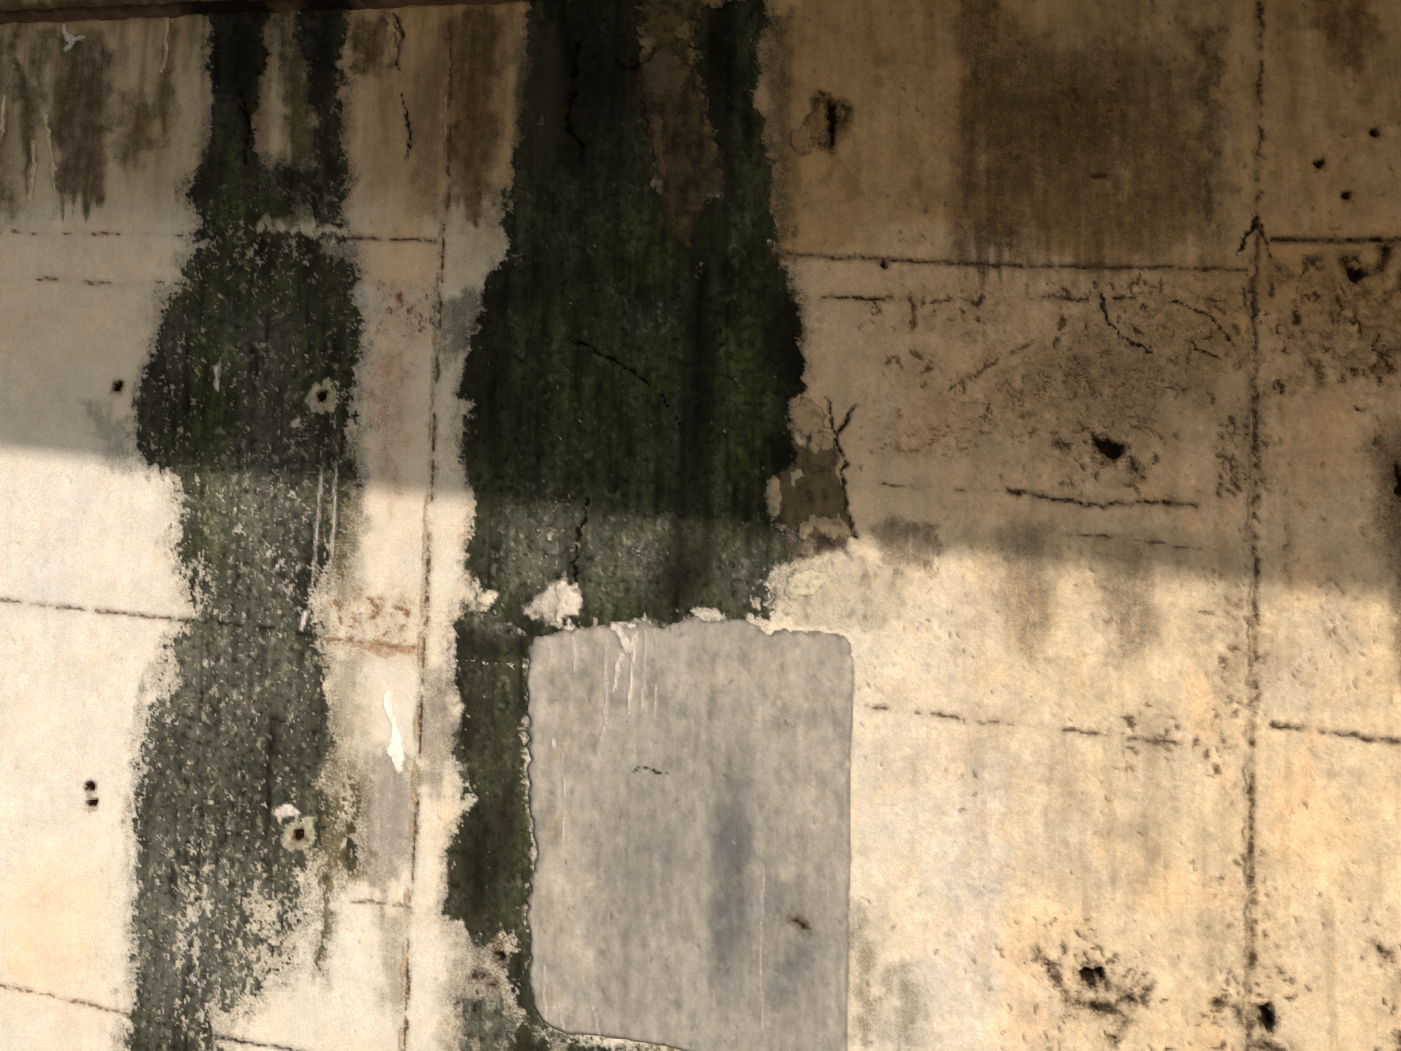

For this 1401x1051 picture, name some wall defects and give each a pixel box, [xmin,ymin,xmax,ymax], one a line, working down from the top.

leakage [0,17,176,219]
leakage [188,8,381,228]
leakage [413,0,656,228]
leakage [685,0,796,257]
peeling [791,90,852,155]
crack [1237,216,1271,257]
crack [1100,293,1152,353]
crack [1172,300,1234,359]
peeling [765,397,853,544]
peeling [785,558,907,627]
leakage [275,804,300,816]
spalling [1024,919,1167,1045]